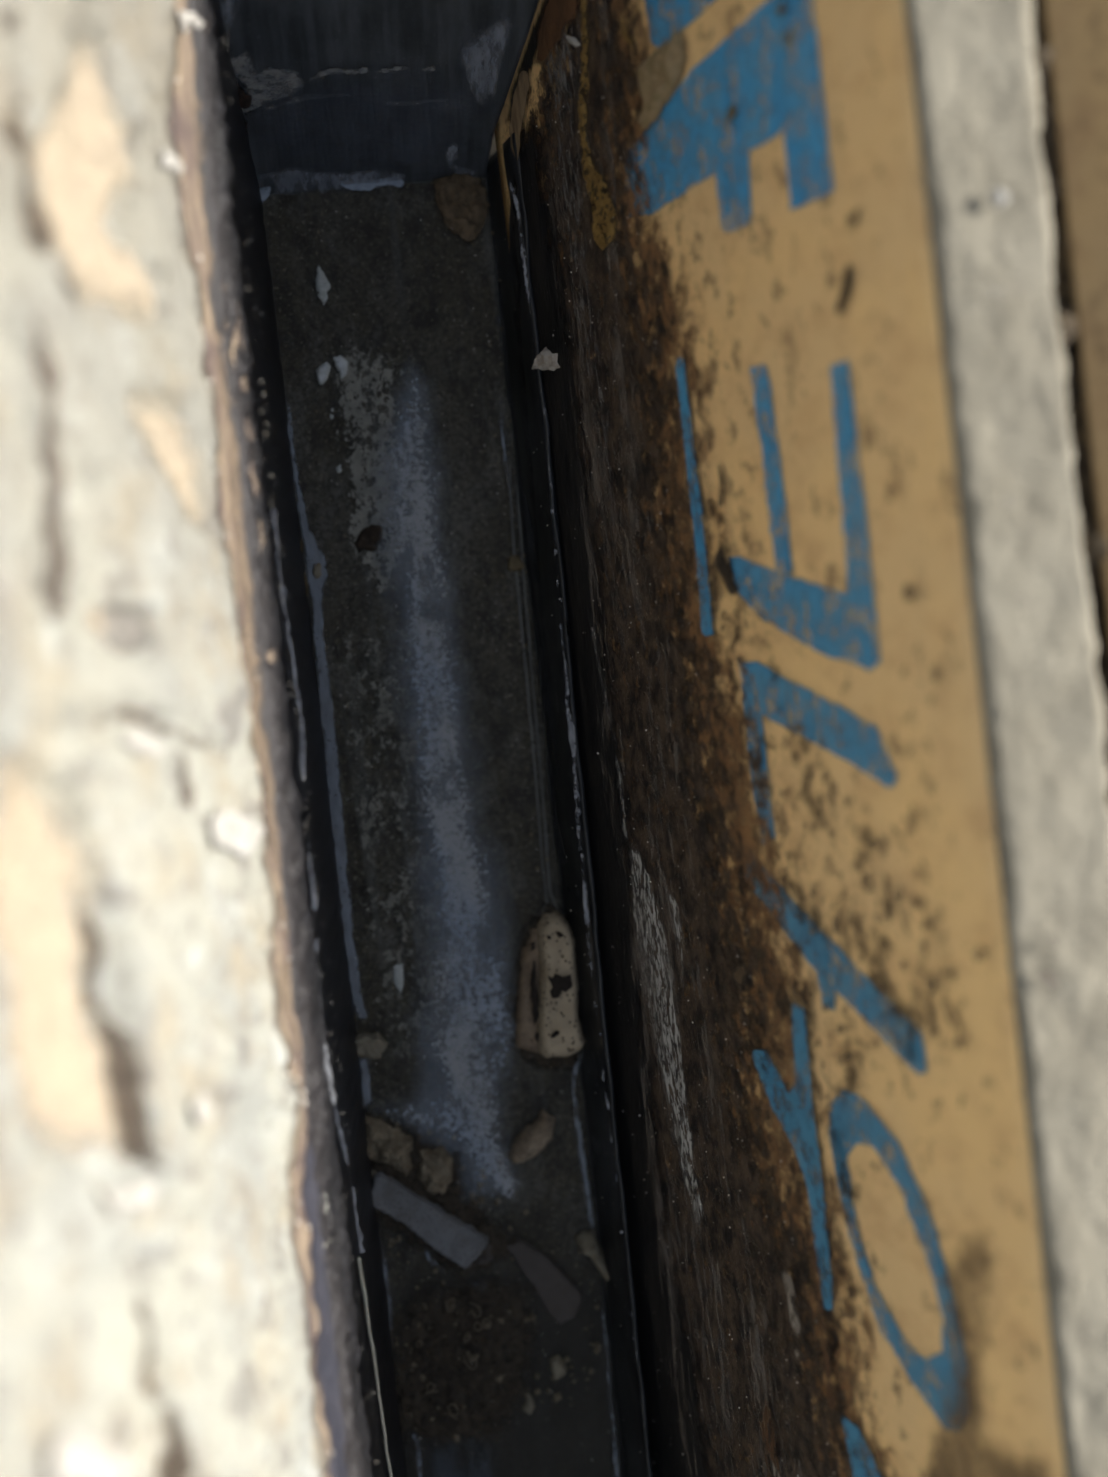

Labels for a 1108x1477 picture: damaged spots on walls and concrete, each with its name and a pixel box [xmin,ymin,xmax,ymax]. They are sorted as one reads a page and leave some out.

leakage [316,265,330,305]
leakage [260,169,404,202]
leakage [231,53,436,113]
corrosion [510,181,530,301]
corrosion [577,0,616,250]
leakage [316,339,411,594]
leakage [287,405,492,1075]
corrosion [560,624,583,860]
leakage [462,0,963,1477]
corrosion [583,880,593,976]
leakage [360,1058,371,1106]
leakage [925,1246,1040,1477]